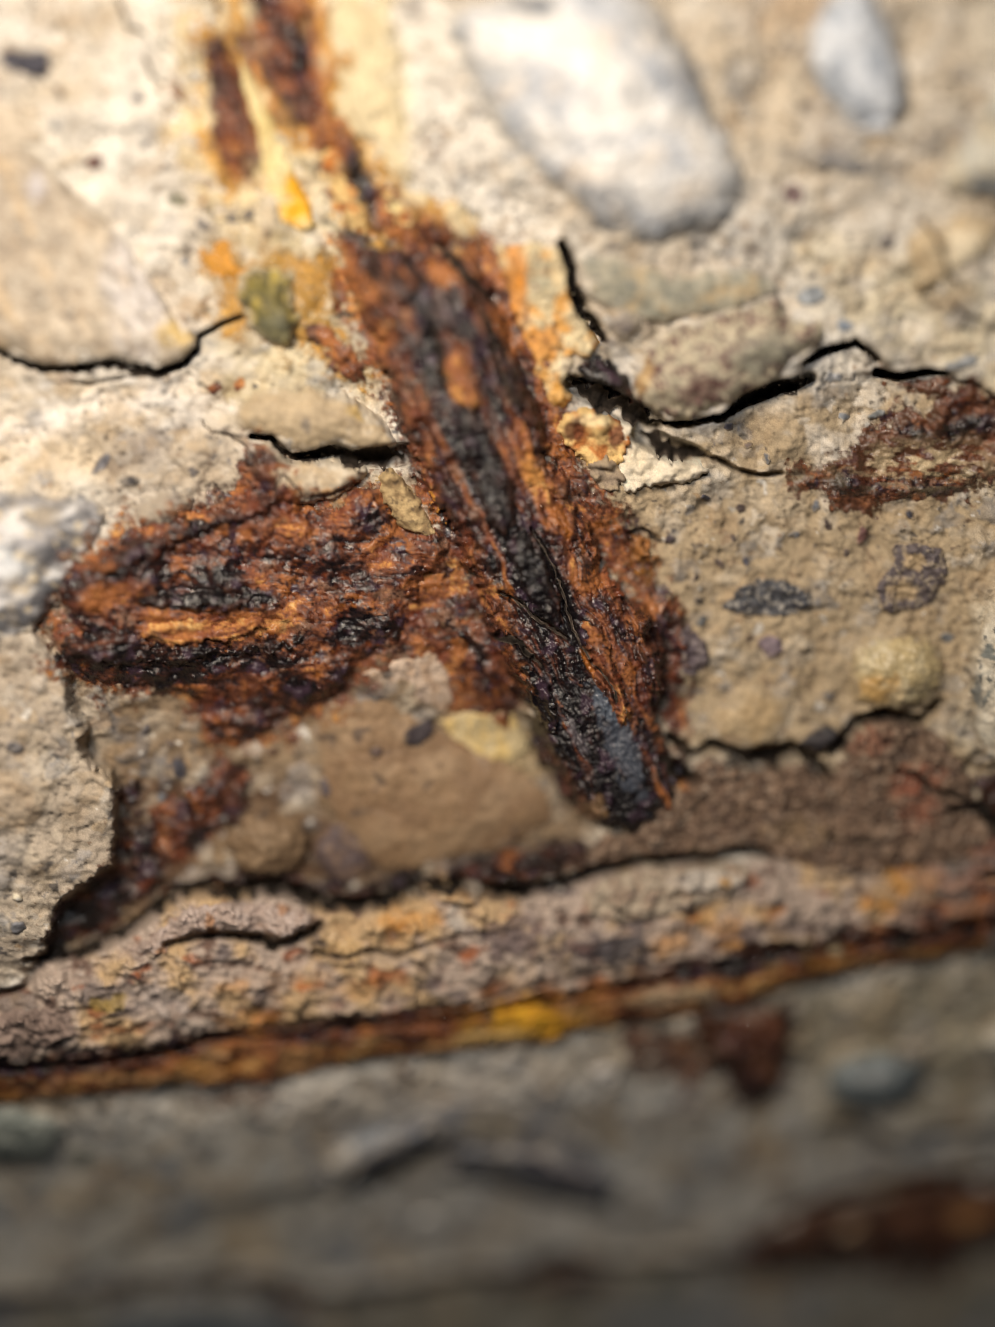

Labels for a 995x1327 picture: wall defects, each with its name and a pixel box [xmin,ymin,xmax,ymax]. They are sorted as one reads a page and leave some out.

crack [560,243,607,340]
crack [0,316,241,386]
crack [201,419,405,507]
corrosion [37,0,695,829]
crack [571,338,946,475]
corrosion [785,363,995,519]
spalling [5,741,25,754]
spalling [166,739,188,780]
spalling [497,716,995,882]
crack [657,700,942,781]
spalling [9,921,27,934]
corrosion [0,749,995,1116]